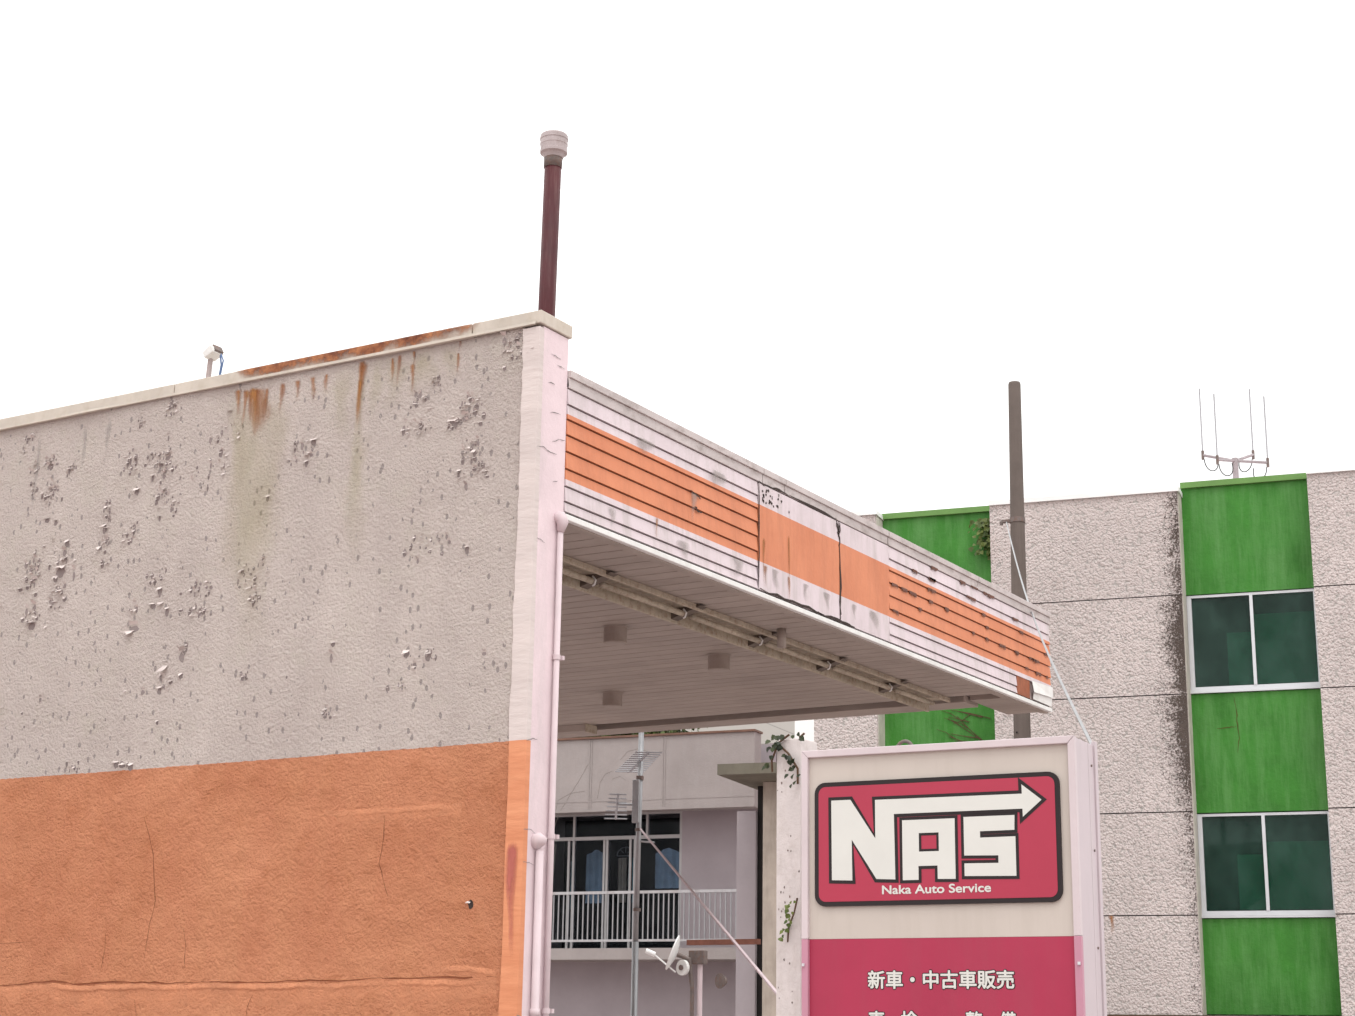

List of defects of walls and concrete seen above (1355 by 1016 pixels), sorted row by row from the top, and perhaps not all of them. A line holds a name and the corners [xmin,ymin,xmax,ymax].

peeling [123,410,240,521]
peeling [284,437,317,467]
corrosion [236,324,471,409]
peeling [401,375,441,436]
peeling [446,391,489,491]
peeling [18,432,77,630]
peeling [95,499,138,569]
peeling [402,531,469,564]
crack [758,481,855,628]
peeling [123,561,213,634]
peeling [401,648,437,669]
crack [0,822,491,1014]